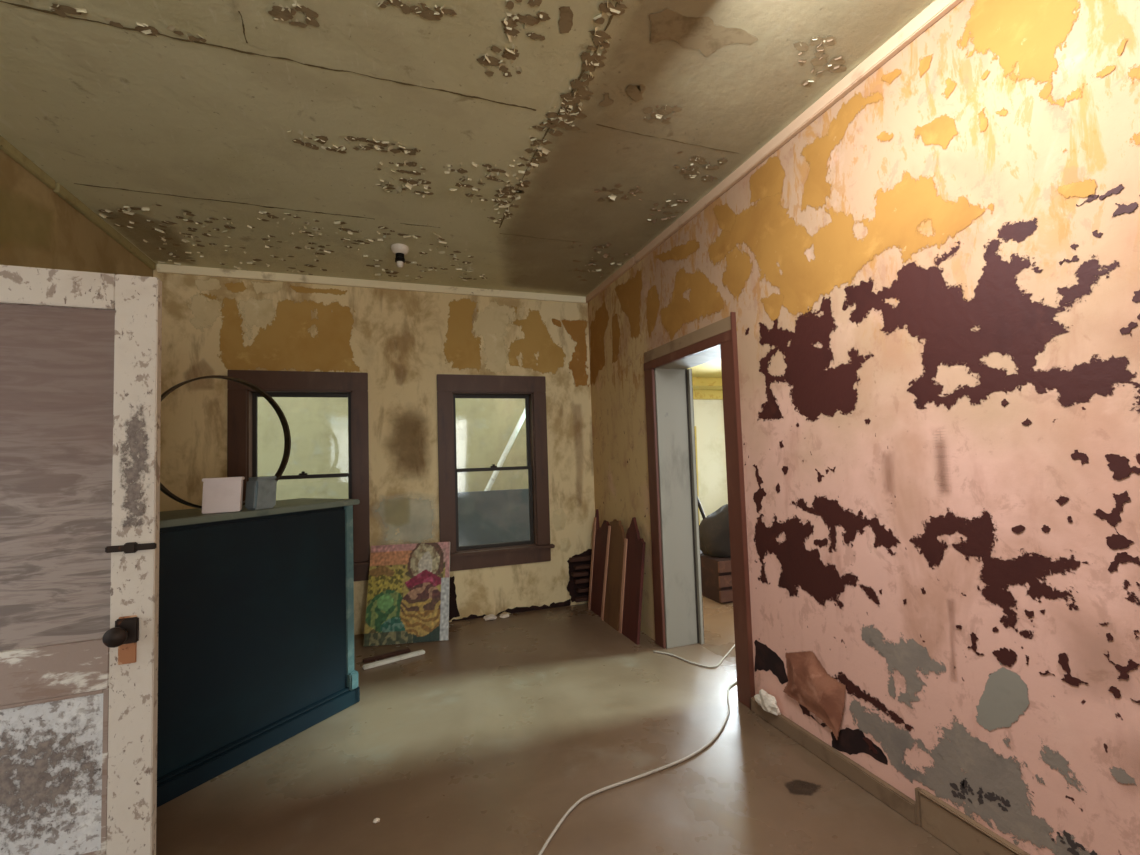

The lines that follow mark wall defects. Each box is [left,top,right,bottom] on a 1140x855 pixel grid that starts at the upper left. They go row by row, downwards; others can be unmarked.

peeling [444,0,627,224]
peeling [957,0,1140,110]
peeling [99,203,487,372]
peeling [444,69,1140,427]
damp [393,417,424,470]
spalling [449,576,460,621]
spalling [567,549,592,602]
spalling [754,640,788,684]
peeling [752,464,1088,639]
peeling [1094,454,1140,605]
peeling [1099,622,1140,703]
flaking render [799,624,1090,855]